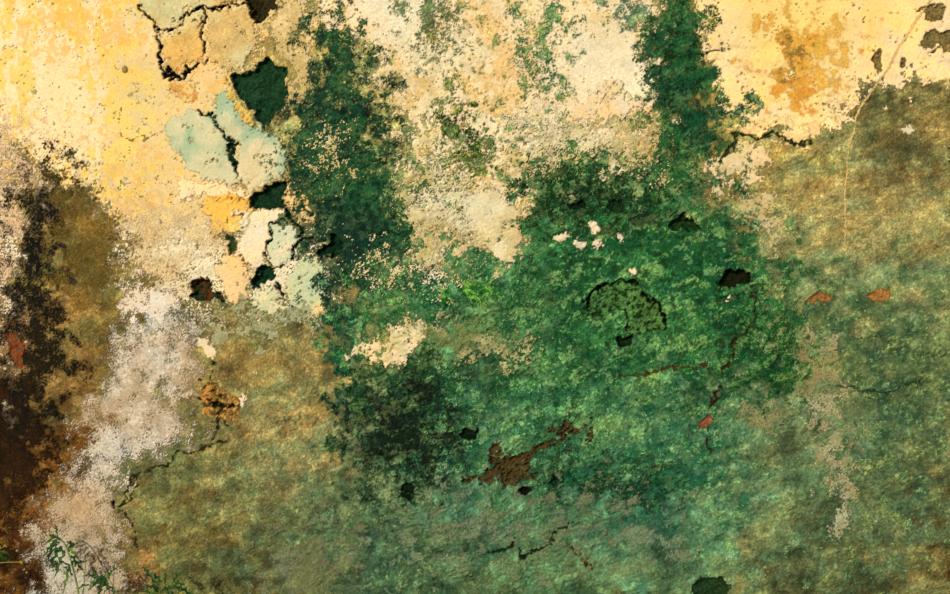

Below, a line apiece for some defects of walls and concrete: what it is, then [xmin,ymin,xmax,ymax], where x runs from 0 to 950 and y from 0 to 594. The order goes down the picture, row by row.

leakage [0,136,210,594]
crack [138,1,252,82]
flaking render [200,380,247,421]
peeling [0,0,681,376]
leakage [737,324,868,541]
flaking render [806,291,833,304]
peeling [694,0,950,260]
flaking render [866,288,890,302]